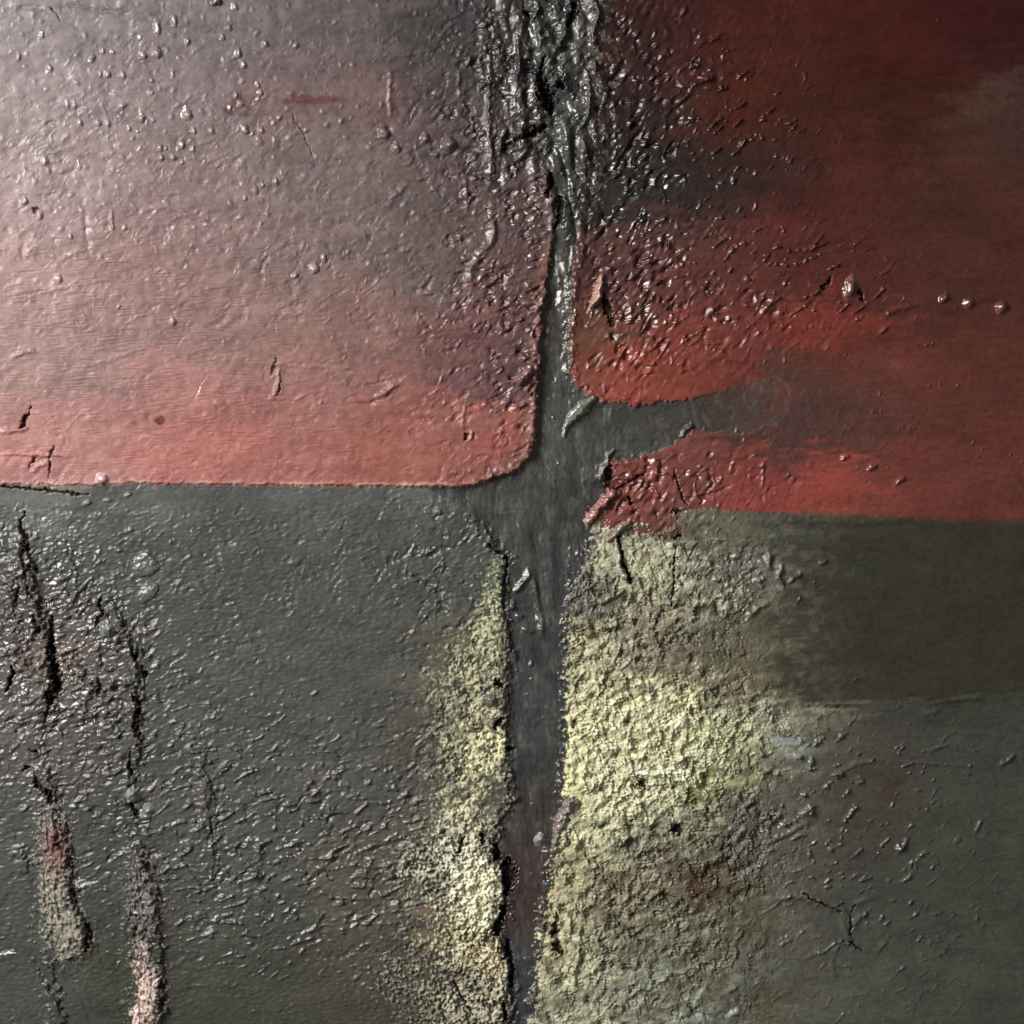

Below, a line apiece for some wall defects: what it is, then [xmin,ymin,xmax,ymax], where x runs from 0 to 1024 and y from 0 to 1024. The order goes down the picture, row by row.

crack [2,446,90,723]
crack [95,598,105,627]
crack [486,543,510,598]
crack [95,677,103,697]
crack [127,646,149,819]
crack [803,892,863,951]